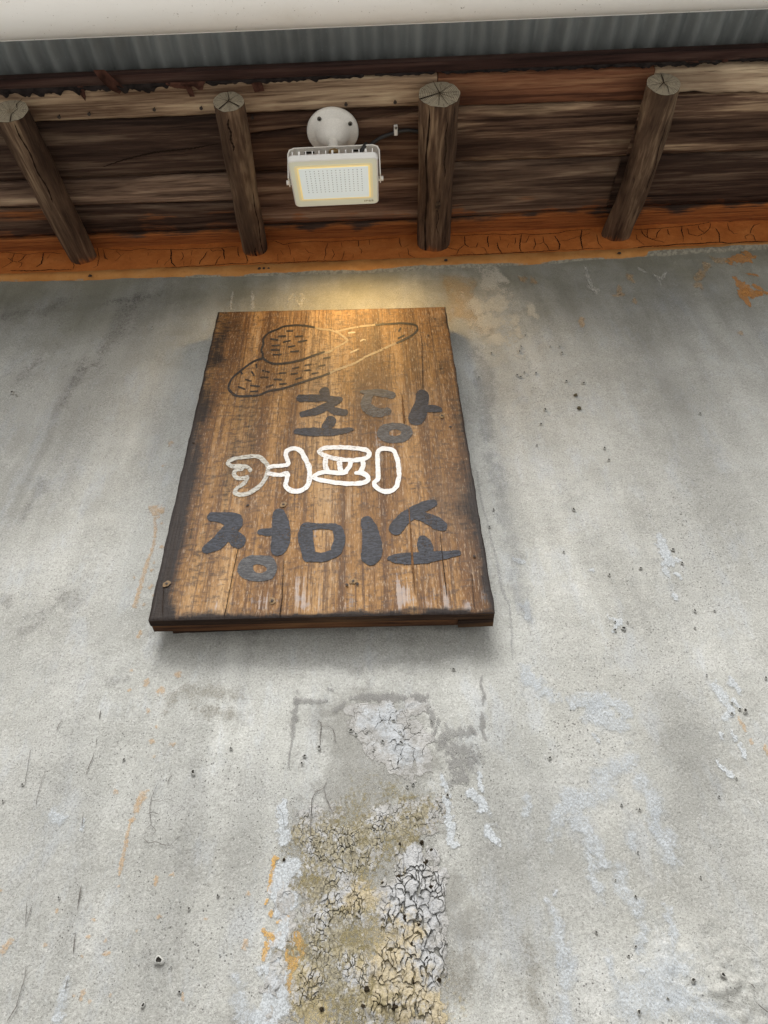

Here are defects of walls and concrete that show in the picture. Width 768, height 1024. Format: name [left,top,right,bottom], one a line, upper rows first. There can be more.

crack [2,237,415,271]
crack [448,229,602,256]
crack [636,221,767,248]
crack [310,783,346,836]
rust [261,855,306,993]